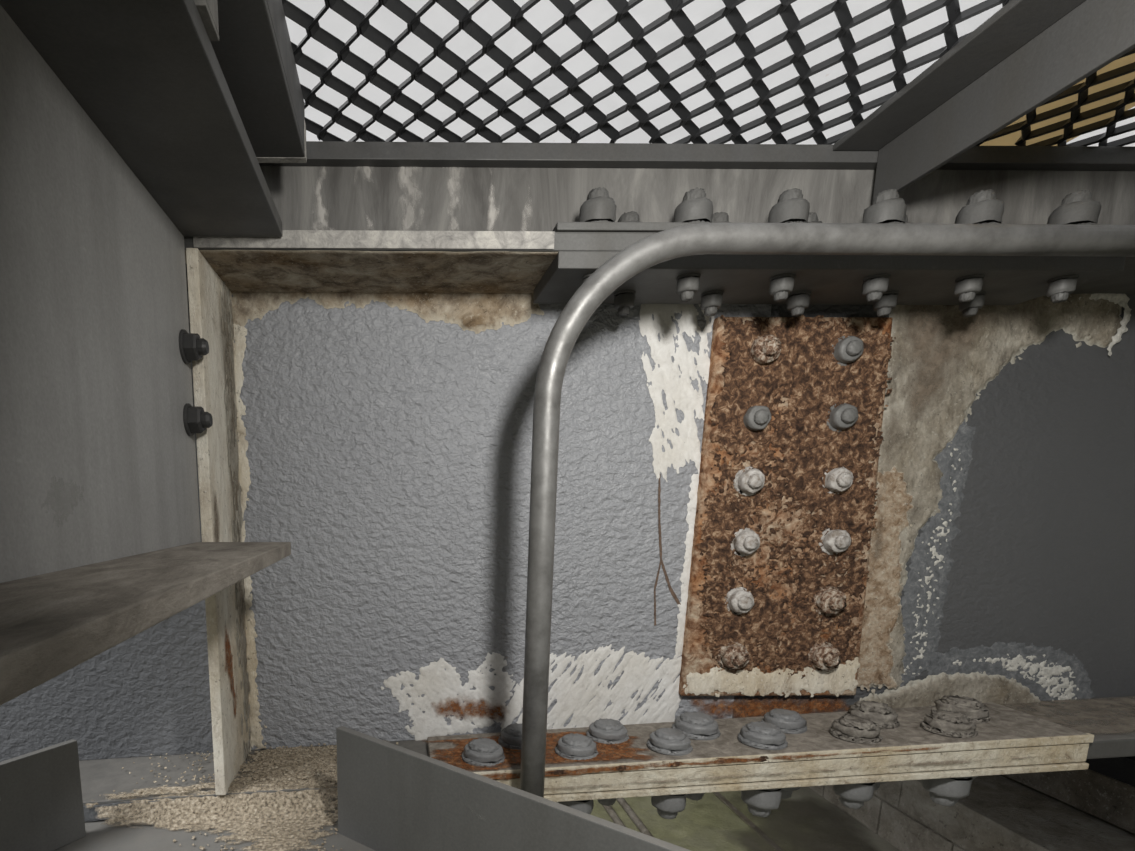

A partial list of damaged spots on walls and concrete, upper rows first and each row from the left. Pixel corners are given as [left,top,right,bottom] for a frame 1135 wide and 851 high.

peeling [185,250,558,542]
crack [654,474,681,626]
rust [696,315,896,679]
spalling [547,293,1132,729]
rust [225,631,237,717]
peeling [235,576,267,761]
peeling [381,652,524,740]
rust [438,700,504,719]
rust [693,699,848,718]
rust [428,736,521,780]
rust [545,731,838,777]